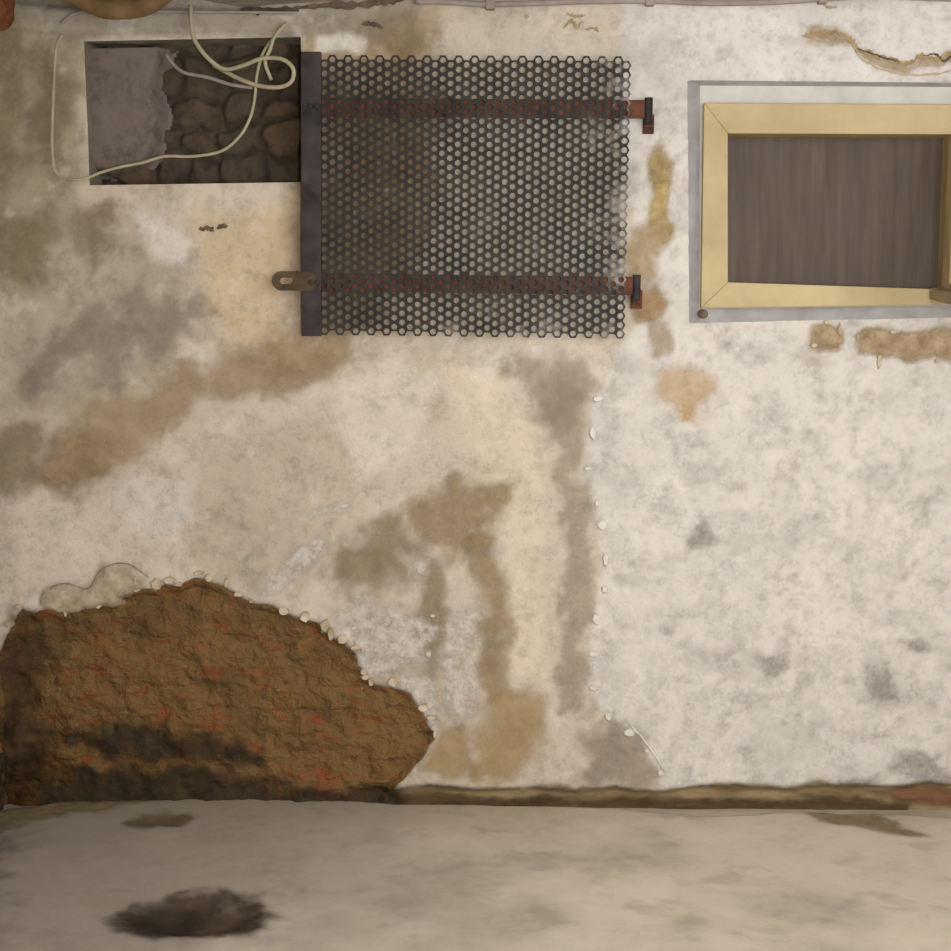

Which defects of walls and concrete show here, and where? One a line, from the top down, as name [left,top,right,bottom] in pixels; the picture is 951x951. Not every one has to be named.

damp [0,331,346,490]
spalling [809,320,844,350]
spalling [856,329,951,369]
damp [264,538,326,591]
damp [337,476,542,781]
spalling [0,570,951,811]